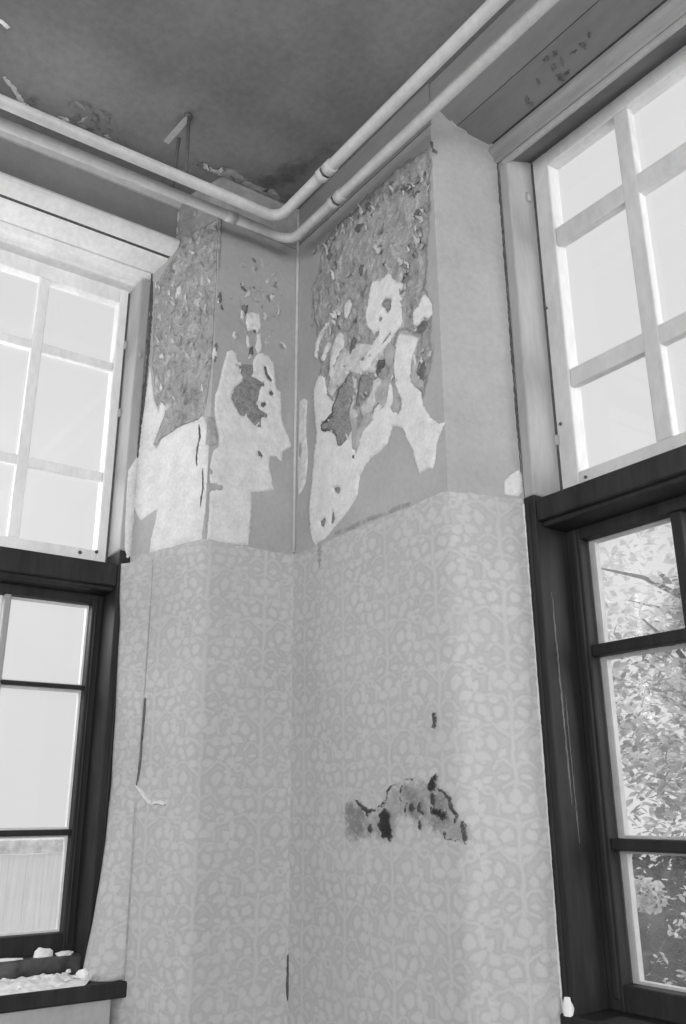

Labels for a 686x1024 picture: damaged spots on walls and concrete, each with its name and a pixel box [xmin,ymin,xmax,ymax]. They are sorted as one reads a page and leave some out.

peeling [125,141,445,558]
crack [196,425,204,506]
flaking render [504,470,522,496]
crack [135,698,166,806]
crack [283,955,291,1001]